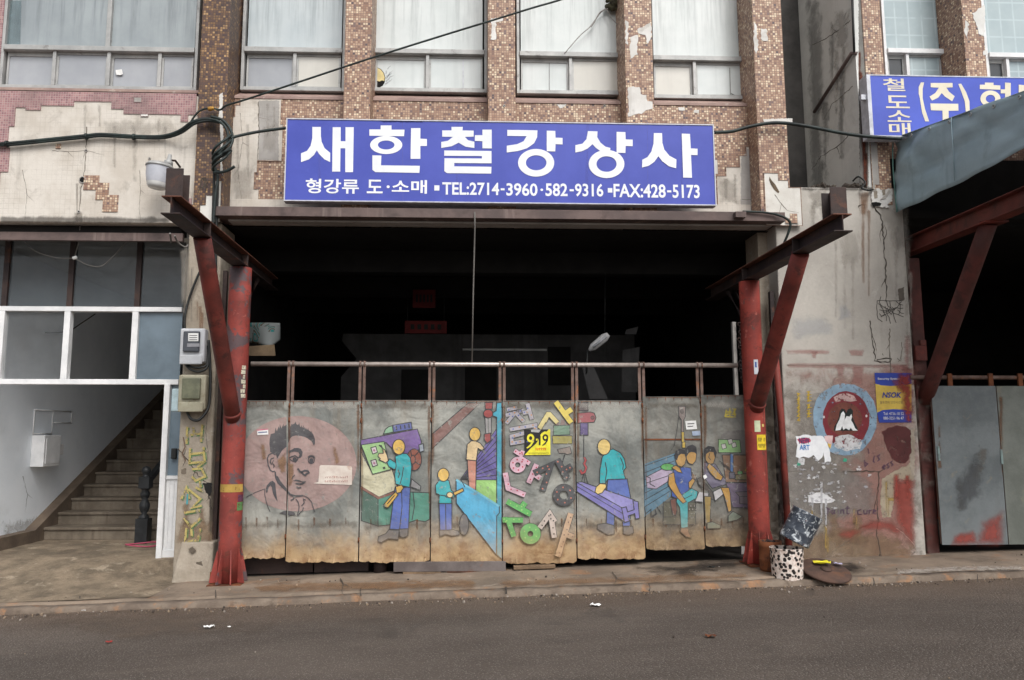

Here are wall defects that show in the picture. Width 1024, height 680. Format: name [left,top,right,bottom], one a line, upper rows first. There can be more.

spalling [625,20,652,58]
spalling [627,86,653,117]
crack [858,203,887,298]